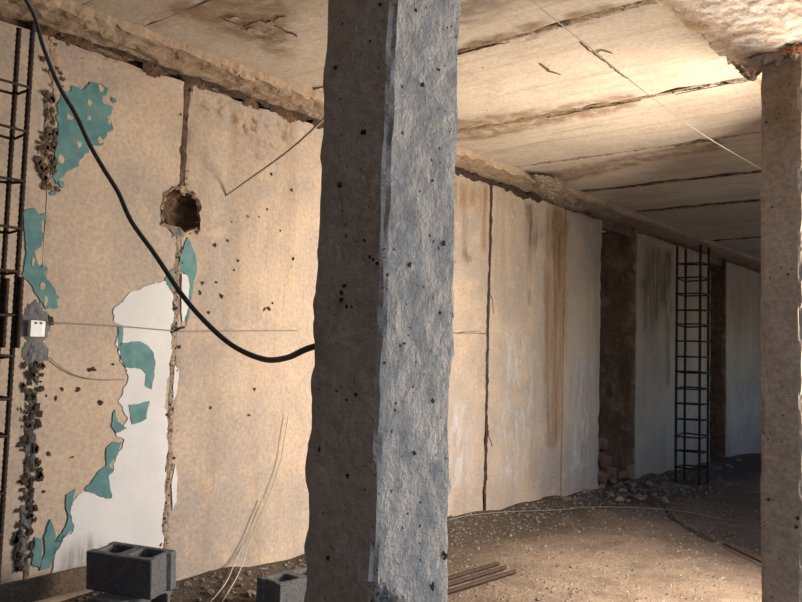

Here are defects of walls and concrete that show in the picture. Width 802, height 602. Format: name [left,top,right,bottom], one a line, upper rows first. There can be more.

crack [457,0,658,55]
crack [13,16,324,129]
crack [580,43,627,79]
peeling [34,35,117,196]
crack [459,78,747,133]
flaking render [12,82,205,573]
crack [455,131,762,510]
crack [619,501,714,541]
spalling [361,581,406,602]